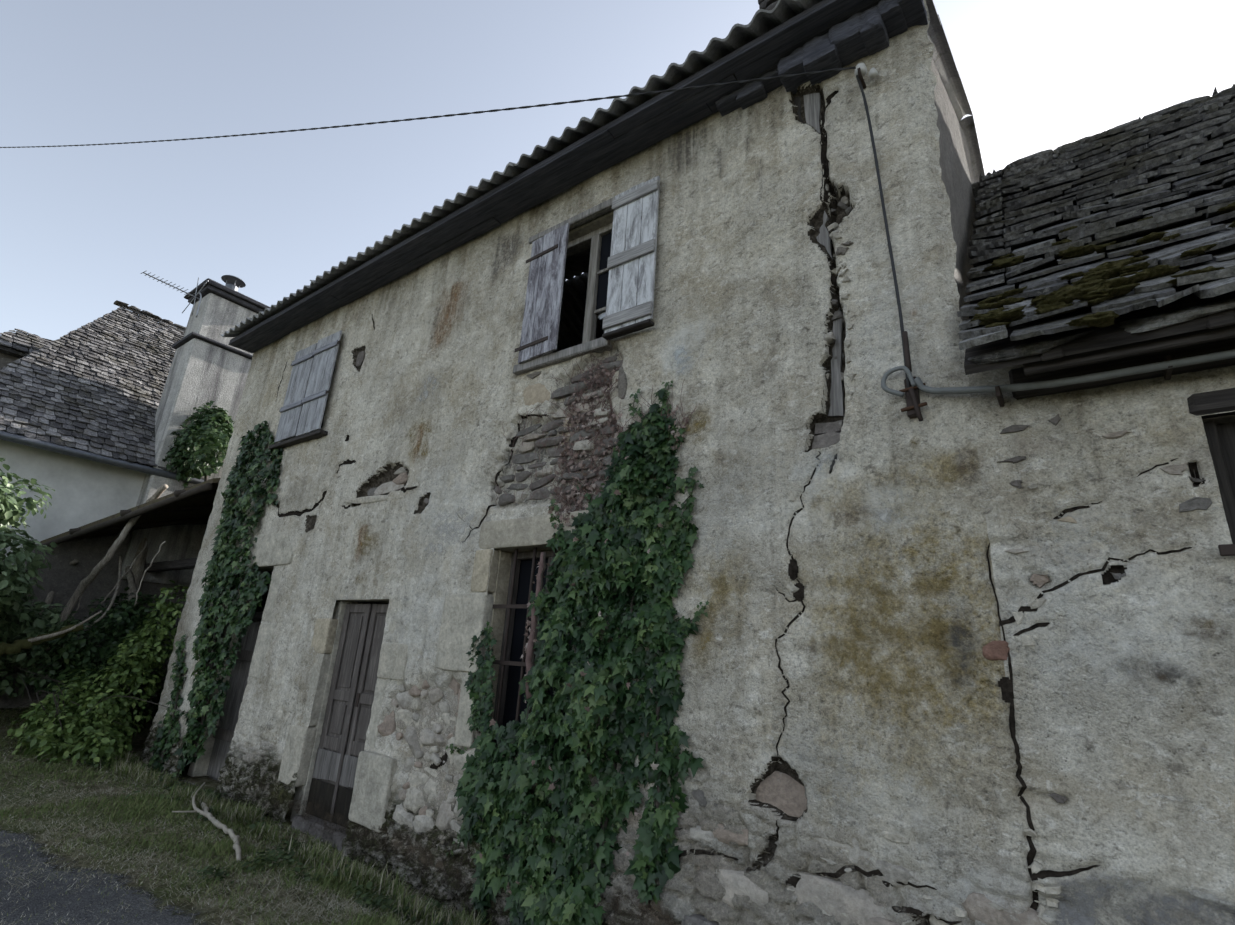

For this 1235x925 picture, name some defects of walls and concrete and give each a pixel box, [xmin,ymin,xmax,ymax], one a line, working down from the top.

spalling [342,462,431,514]
spalling [487,341,630,510]
crack [775,83,856,757]
peeling [377,677,481,850]
peeling [675,756,1048,925]
crack [986,543,1192,925]